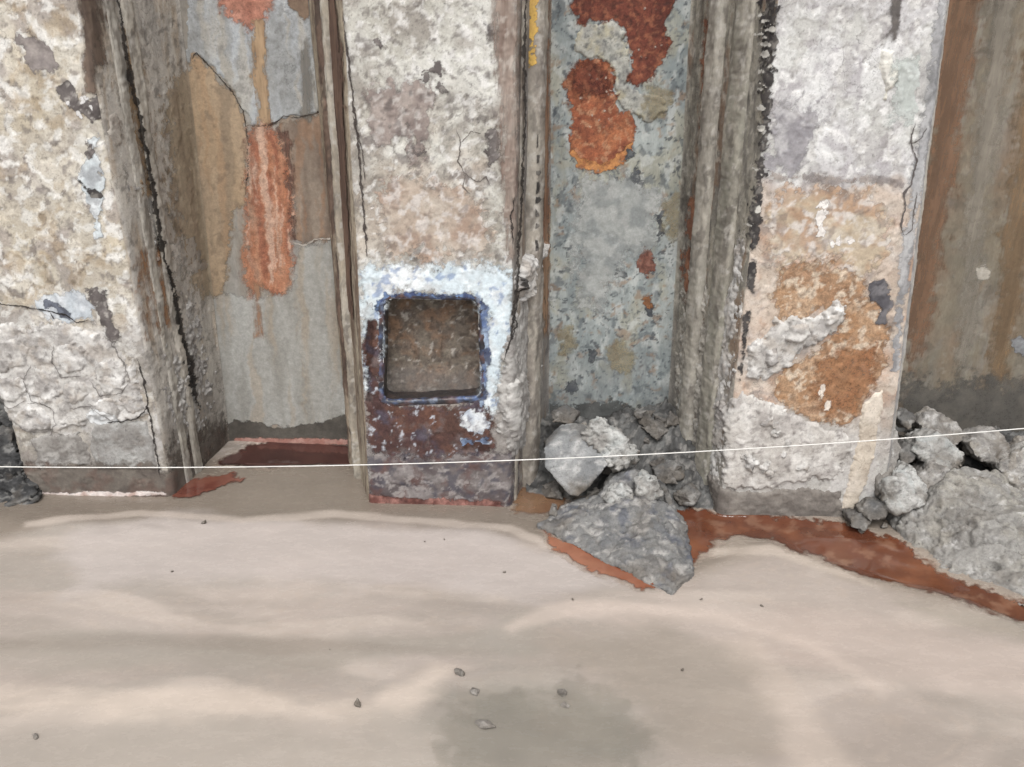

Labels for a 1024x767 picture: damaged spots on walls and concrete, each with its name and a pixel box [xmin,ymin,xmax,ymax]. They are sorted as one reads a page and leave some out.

peeling [14,34,124,239]
rust [240,0,353,336]
crack [343,14,368,253]
crack [504,0,527,360]
rust [542,0,675,334]
crack [900,124,927,235]
rust [907,0,983,371]
crack [107,360,160,475]
water stain [363,291,491,407]
peeling [765,323,811,369]
rust [767,259,891,426]
peeling [821,303,845,326]